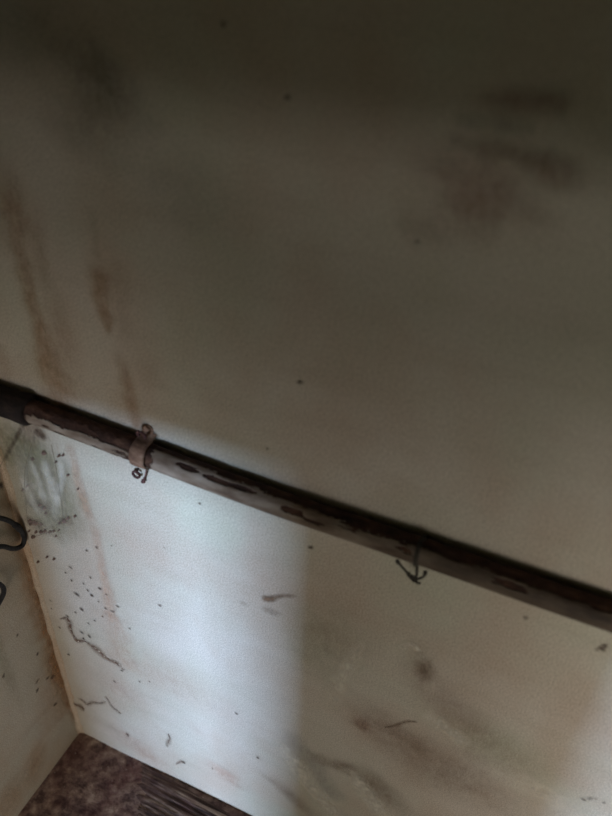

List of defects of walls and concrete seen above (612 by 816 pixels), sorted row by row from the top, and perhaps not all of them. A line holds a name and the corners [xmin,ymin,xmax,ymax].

corrosion [25,399,137,447]